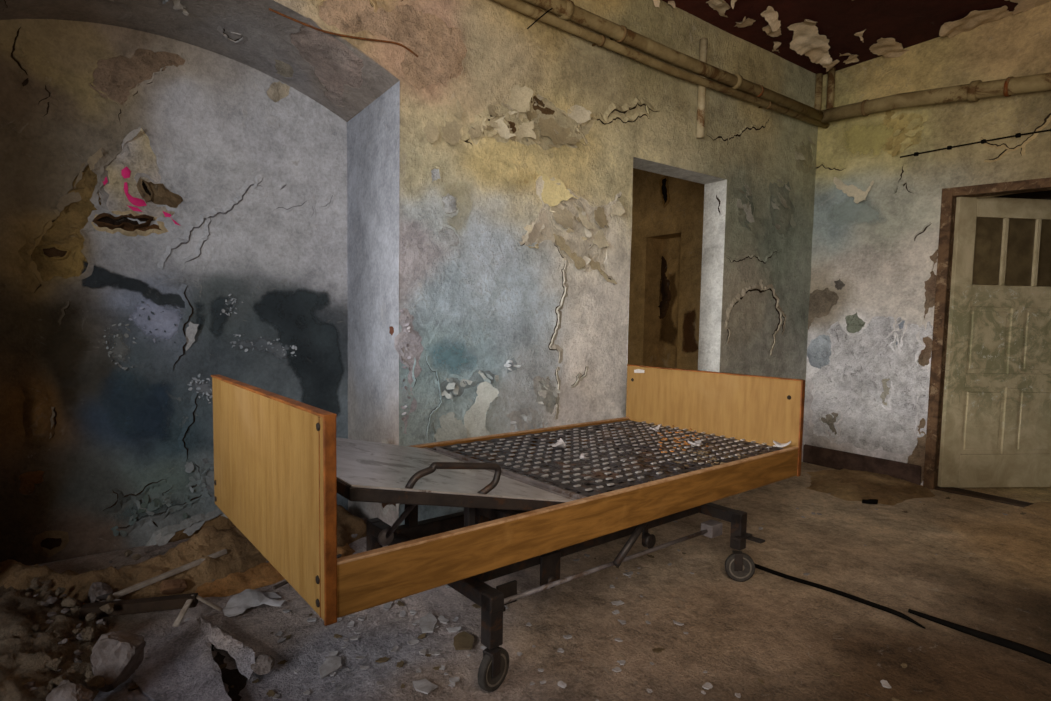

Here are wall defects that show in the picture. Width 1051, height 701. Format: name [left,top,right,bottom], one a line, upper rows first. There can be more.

spalling [282,0,598,155]
peeling [706,0,909,72]
peeling [939,0,1051,39]
spalling [22,125,191,288]
damp [82,262,232,337]
crack [157,174,335,371]
damp [253,289,344,415]
peeling [389,308,423,434]
crack [520,192,622,420]
peeling [517,169,628,286]
crack [723,249,786,355]
spalling [807,245,938,486]